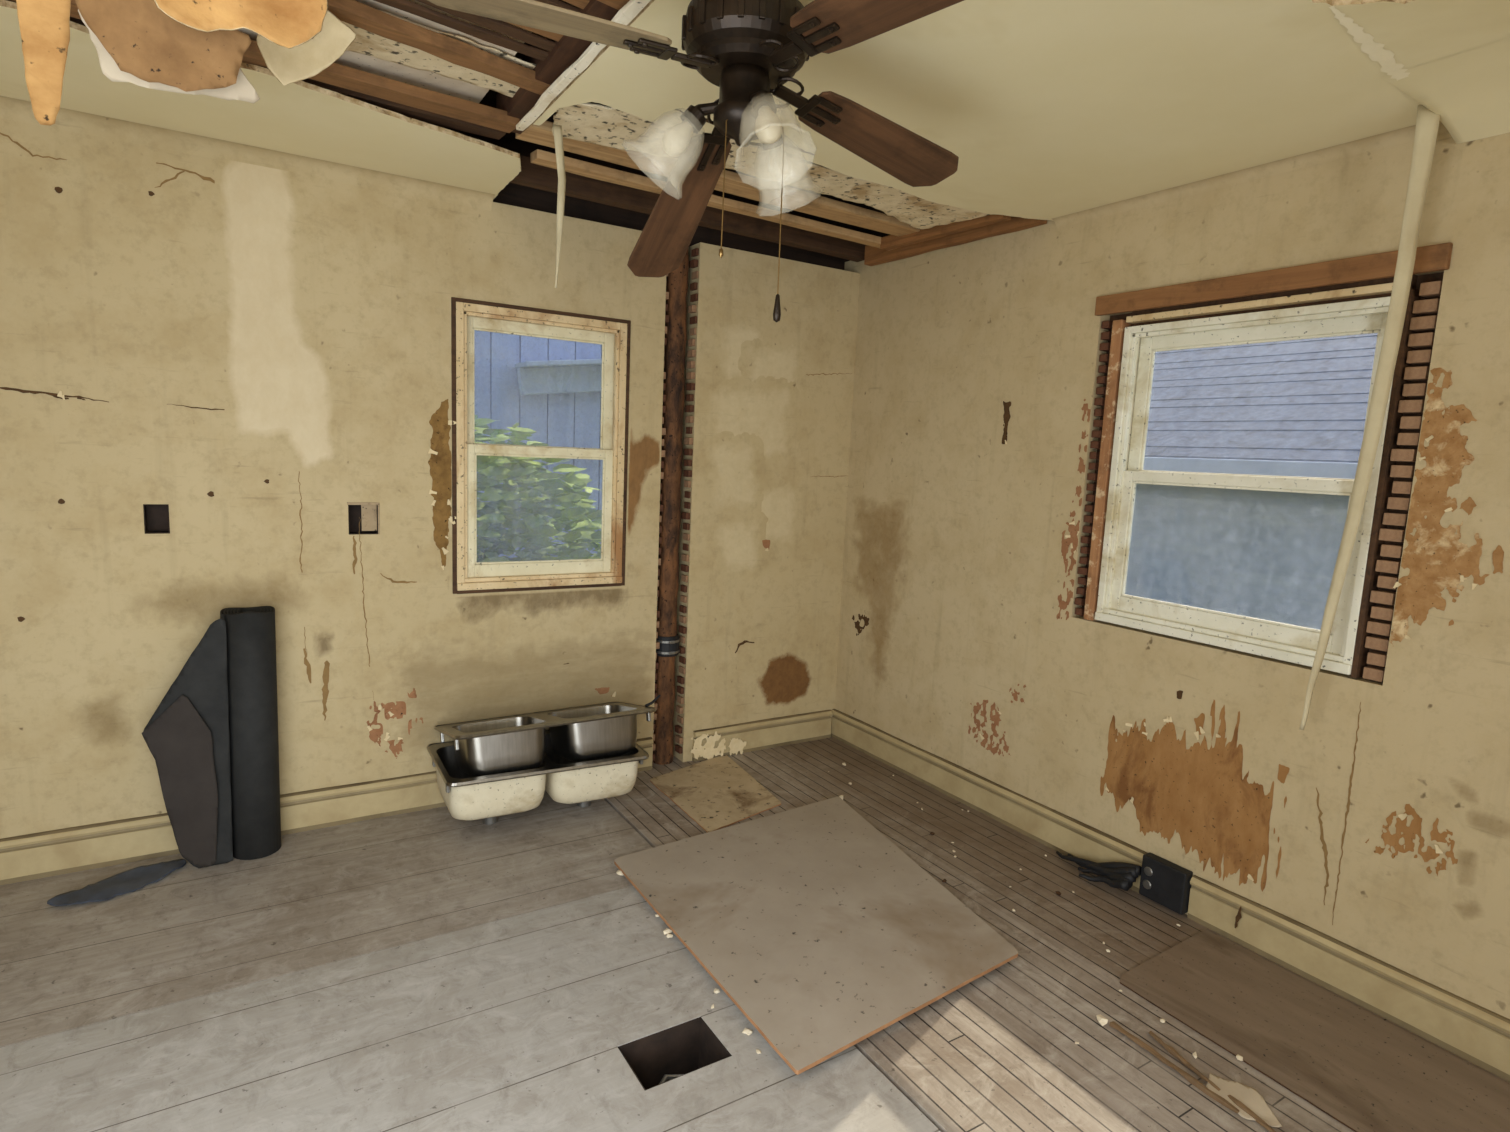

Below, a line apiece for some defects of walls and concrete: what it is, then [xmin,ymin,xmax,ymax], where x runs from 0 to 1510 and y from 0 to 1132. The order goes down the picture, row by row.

crack [0,387,108,402]
crack [172,403,224,411]
flaking render [428,399,457,570]
flaking render [1390,368,1504,644]
peeling [367,688,423,759]
peeling [968,684,1026,756]
peeling [1100,700,1290,892]
peeling [1365,804,1458,876]